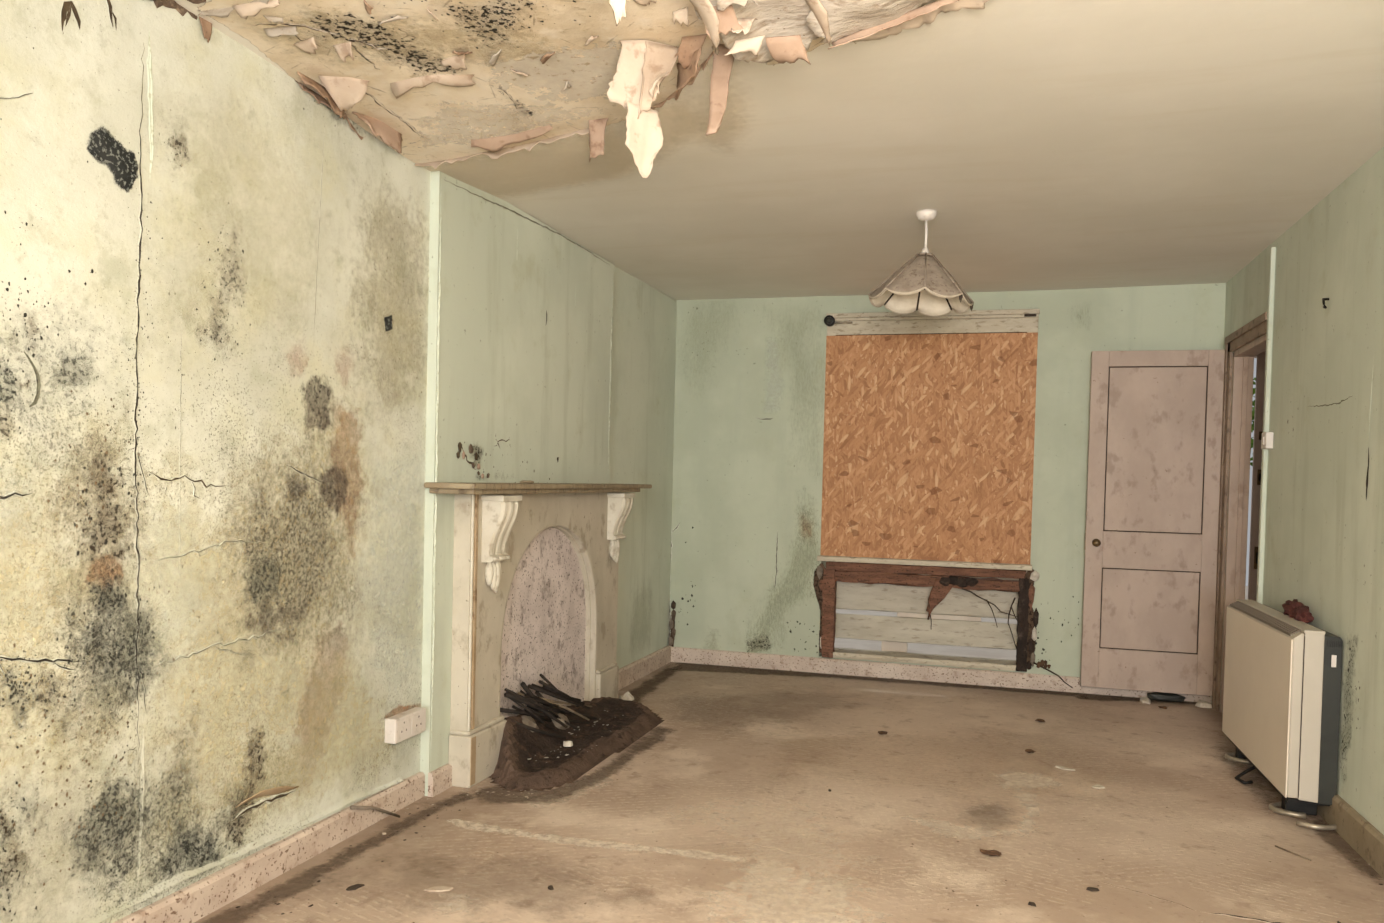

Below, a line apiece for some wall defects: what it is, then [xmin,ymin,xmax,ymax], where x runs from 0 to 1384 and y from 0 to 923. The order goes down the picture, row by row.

peeling [61,1,81,31]
peeling [106,0,117,30]
flaking render [153,0,197,20]
damp [410,0,555,49]
peeling [232,0,369,111]
damp [308,5,462,76]
crack [0,92,32,100]
damp [87,127,139,208]
damp [361,315,393,334]
crack [126,42,289,782]
crack [0,491,33,500]
crack [0,655,94,675]